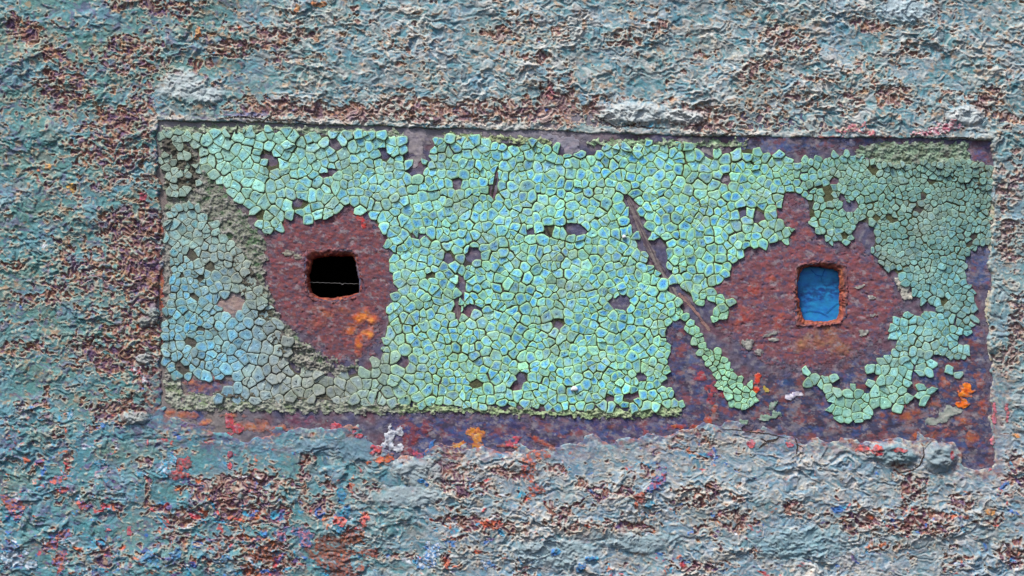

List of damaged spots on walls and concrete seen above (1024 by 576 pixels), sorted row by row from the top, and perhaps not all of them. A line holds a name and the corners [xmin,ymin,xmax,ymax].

crack [209,112,310,154]
crack [594,115,702,137]
crack [903,134,978,142]
rust [258,206,396,368]
peeling [157,125,994,424]
rust [712,195,904,394]
rust [642,370,725,465]
rust [874,371,990,448]